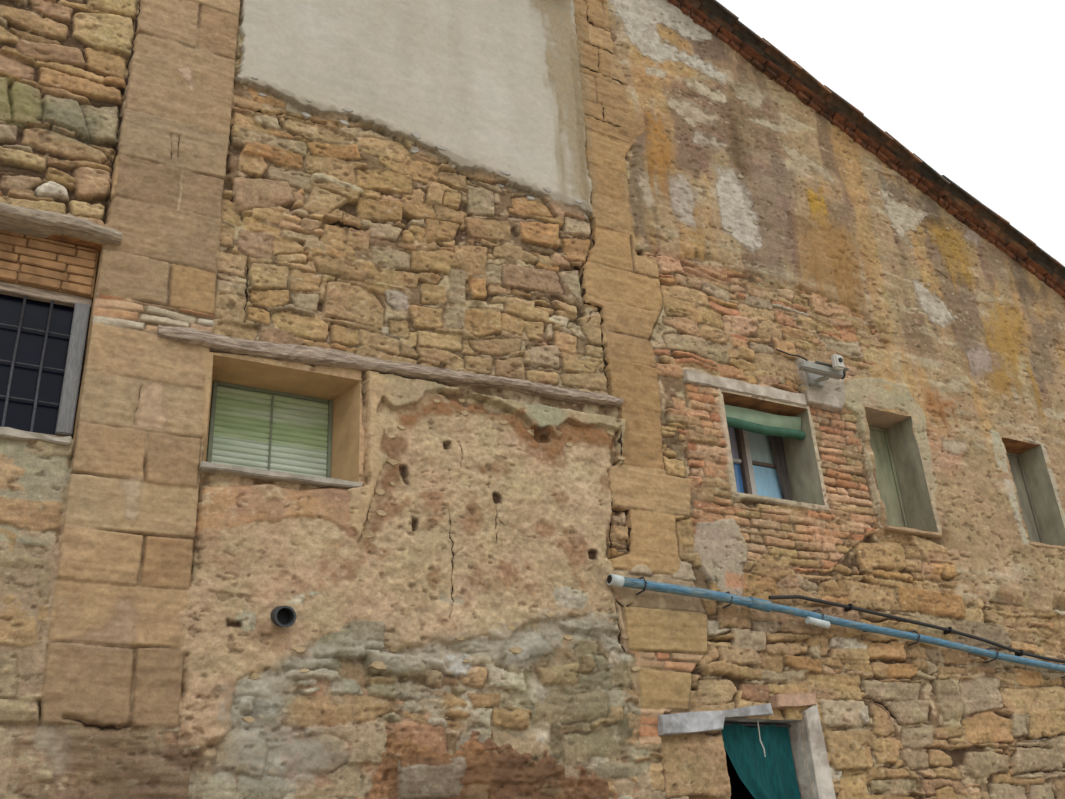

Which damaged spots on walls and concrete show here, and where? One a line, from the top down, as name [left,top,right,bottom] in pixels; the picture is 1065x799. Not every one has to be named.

flaking render [609,0,835,183]
flaking render [638,171,697,226]
flaking render [716,167,762,251]
crack [565,222,608,387]
flaking render [361,399,625,538]
crack [448,507,462,605]
flaking render [234,644,336,723]
flaking render [351,613,606,670]